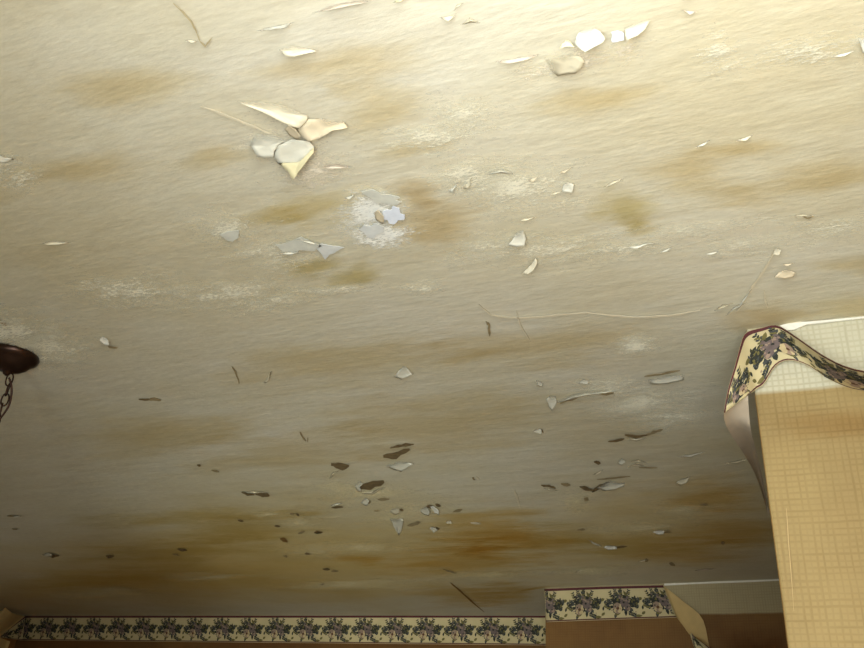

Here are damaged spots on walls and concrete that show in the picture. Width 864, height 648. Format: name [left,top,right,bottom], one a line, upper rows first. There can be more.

peeling [552,21,649,76]
peeling [241,103,348,180]
flaking render [346,189,405,239]
flaking render [276,237,344,260]
peeling [331,463,349,477]
peeling [383,443,414,472]
peeling [541,459,657,502]
peeling [355,480,462,535]
peeling [663,585,709,647]